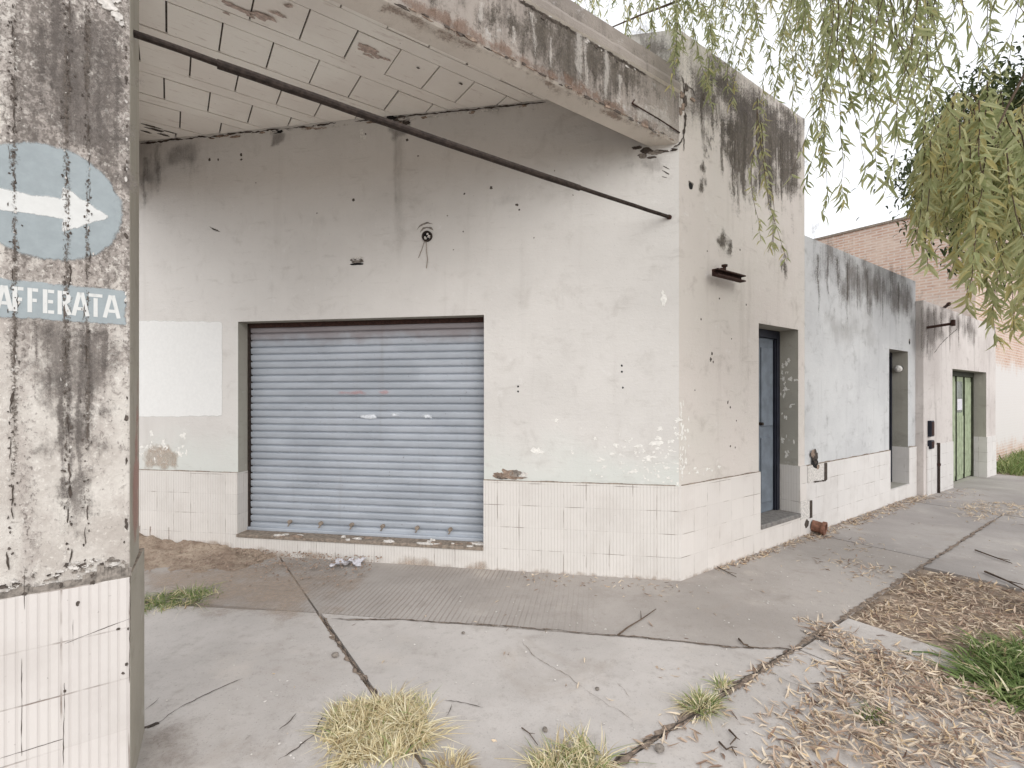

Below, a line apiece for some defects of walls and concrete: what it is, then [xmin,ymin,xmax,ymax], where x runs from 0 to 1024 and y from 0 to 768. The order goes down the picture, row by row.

damp [30,0,129,166]
spalling [394,3,680,178]
damp [476,0,654,105]
damp [686,57,804,210]
damp [817,235,975,352]
damp [33,319,119,511]
peeling [590,400,721,485]
peeling [780,358,798,420]